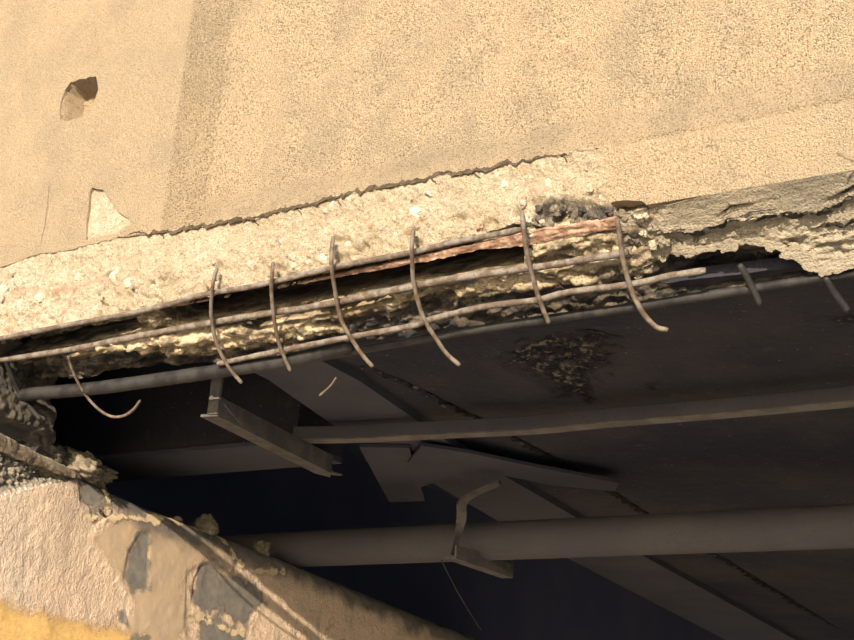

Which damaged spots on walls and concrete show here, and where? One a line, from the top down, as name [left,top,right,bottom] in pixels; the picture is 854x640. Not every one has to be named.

crack [665,152,854,237]
spalling [0,143,854,402]
rust [277,216,617,288]
spalling [0,454,74,497]